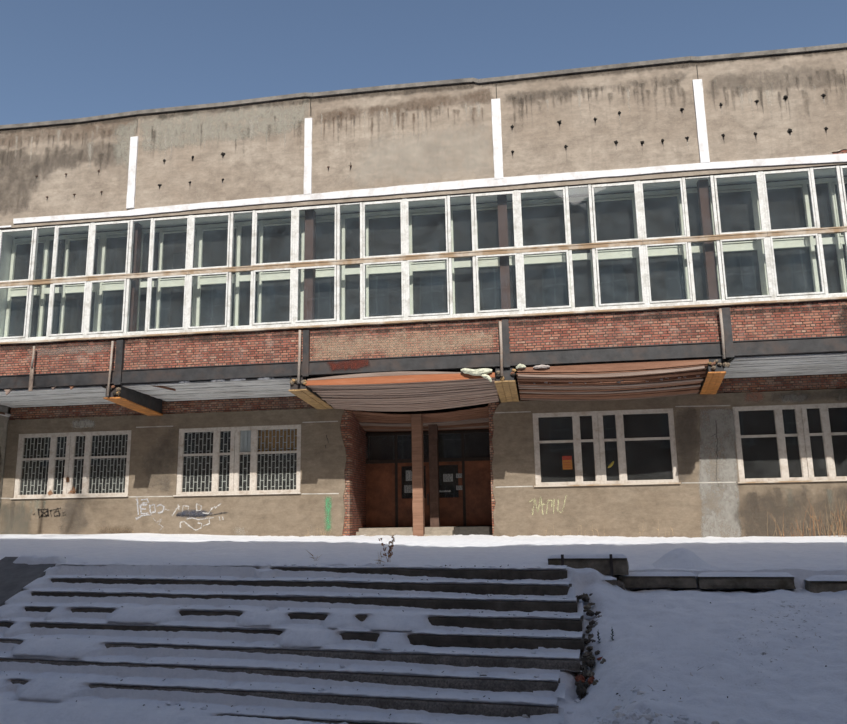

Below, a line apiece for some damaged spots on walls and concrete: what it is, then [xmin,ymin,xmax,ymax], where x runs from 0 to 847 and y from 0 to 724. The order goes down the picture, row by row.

water stain [0,100,308,211]